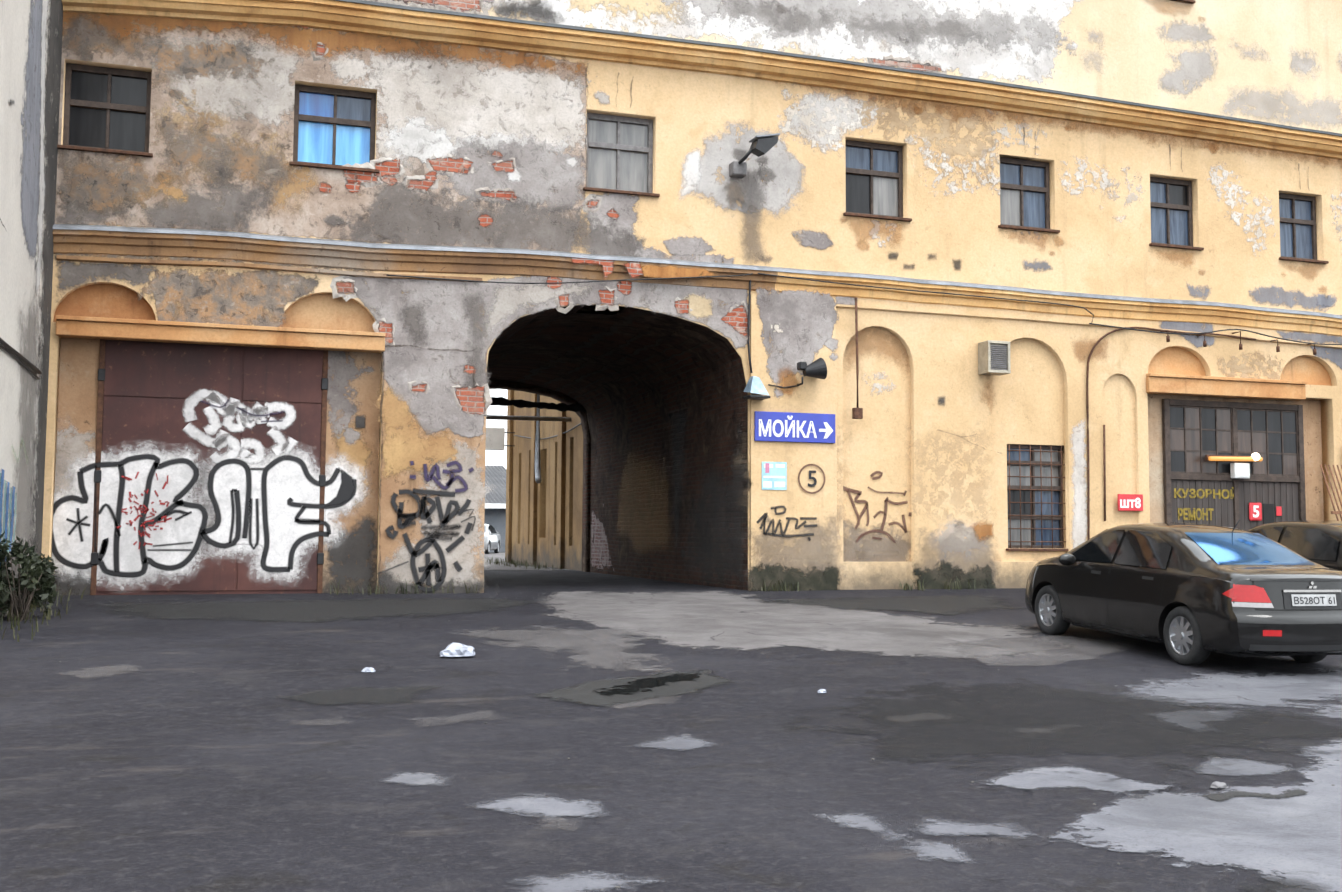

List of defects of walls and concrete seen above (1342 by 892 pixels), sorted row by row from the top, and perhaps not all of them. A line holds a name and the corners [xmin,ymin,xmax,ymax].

peeling [365,0,1097,85]
flaking render [1161,23,1216,94]
flaking render [10,0,43,267]
peeling [777,83,1047,195]
flaking render [1224,91,1342,125]
leakage [7,0,373,578]
flaking render [147,32,857,587]
peeling [868,220,914,268]
flaking render [1024,261,1051,271]
peeling [1061,156,1142,222]
flaking render [1188,284,1209,299]
peeling [1207,163,1275,256]